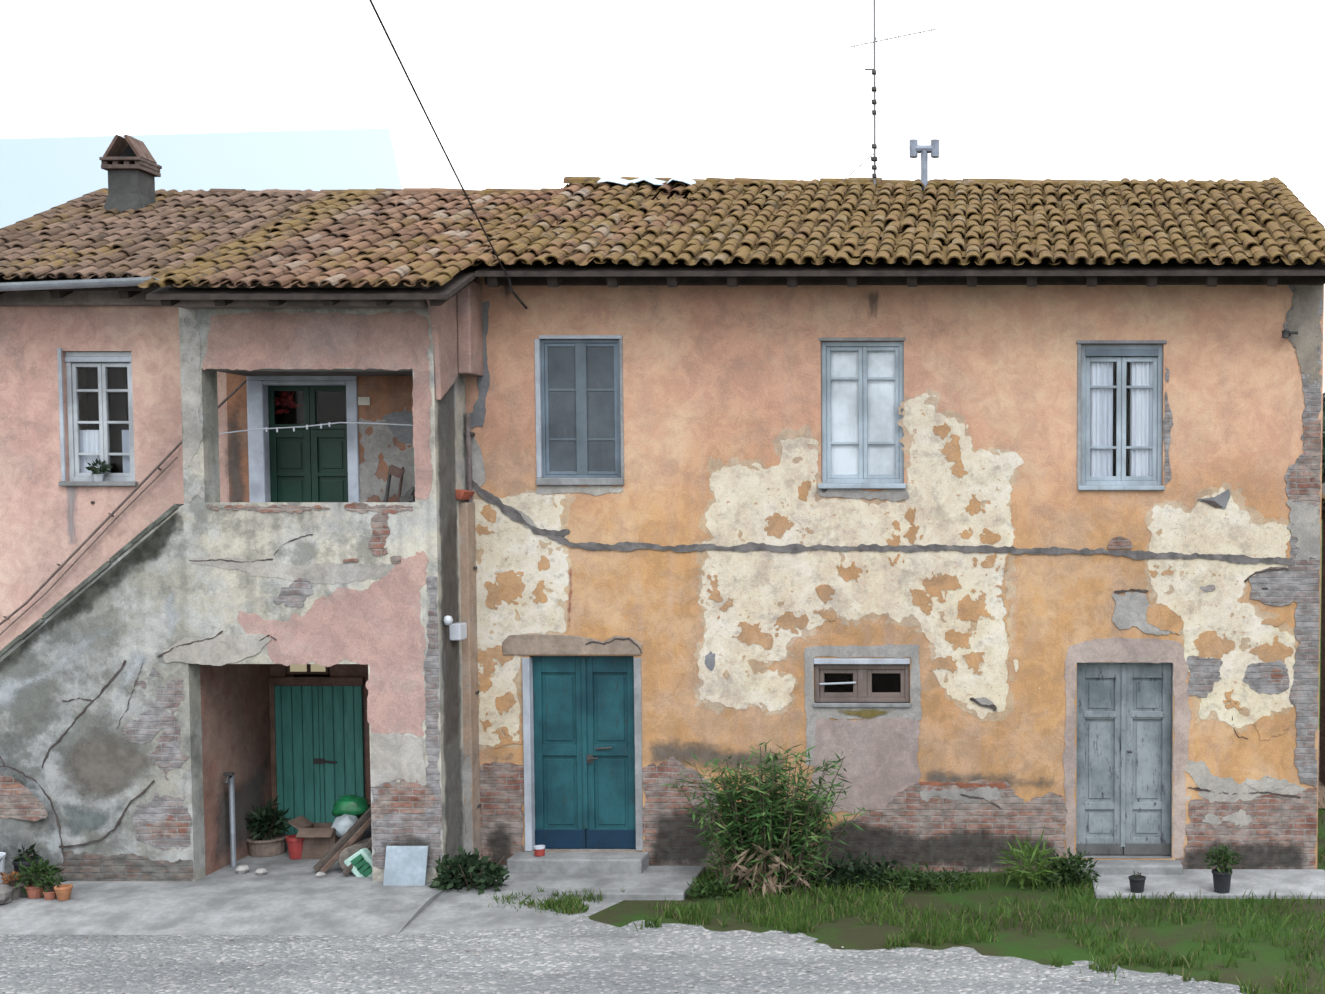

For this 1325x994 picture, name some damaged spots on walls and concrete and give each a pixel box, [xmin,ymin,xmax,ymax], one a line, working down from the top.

flaking render [0,774,48,821]
crack [0,631,223,851]
flaking render [179,307,415,608]
flaking render [371,576,443,869]
flaking render [464,490,576,866]
flaking render [691,388,1024,722]
crack [466,476,1294,565]
flaking render [1107,285,1323,869]